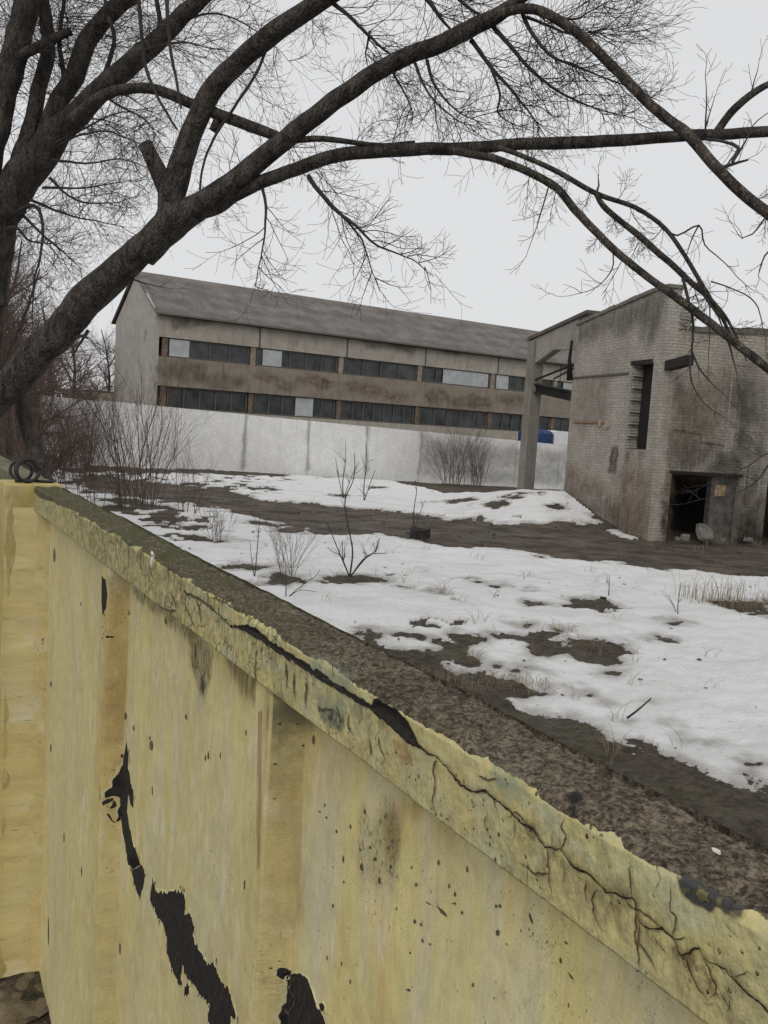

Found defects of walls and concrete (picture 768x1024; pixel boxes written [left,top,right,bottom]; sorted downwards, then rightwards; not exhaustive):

spalling [101,576,114,639]
crack [120,536,250,627]
crack [284,644,384,762]
peeling [101,712,238,1024]
crack [414,733,768,1013]
spalling [678,875,744,916]
peeling [273,966,327,1024]